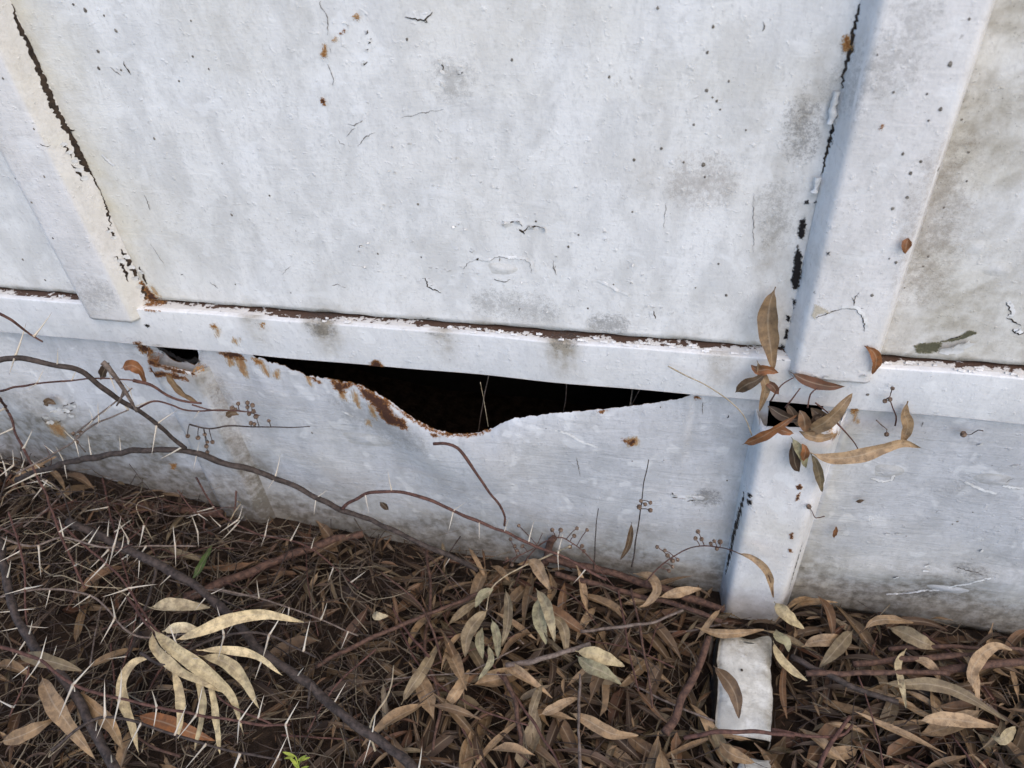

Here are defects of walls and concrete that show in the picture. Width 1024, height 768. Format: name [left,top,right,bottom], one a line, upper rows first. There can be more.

crack [841,4,861,89]
crack [12,5,115,225]
crack [821,124,835,174]
corrosion [139,281,167,313]
corrosion [132,341,207,382]
peeling [155,346,200,364]
corrosion [210,323,279,379]
peeling [577,337,650,347]
crack [816,293,869,347]
peeling [906,330,984,373]
corrosion [306,376,491,438]
crack [725,492,744,575]